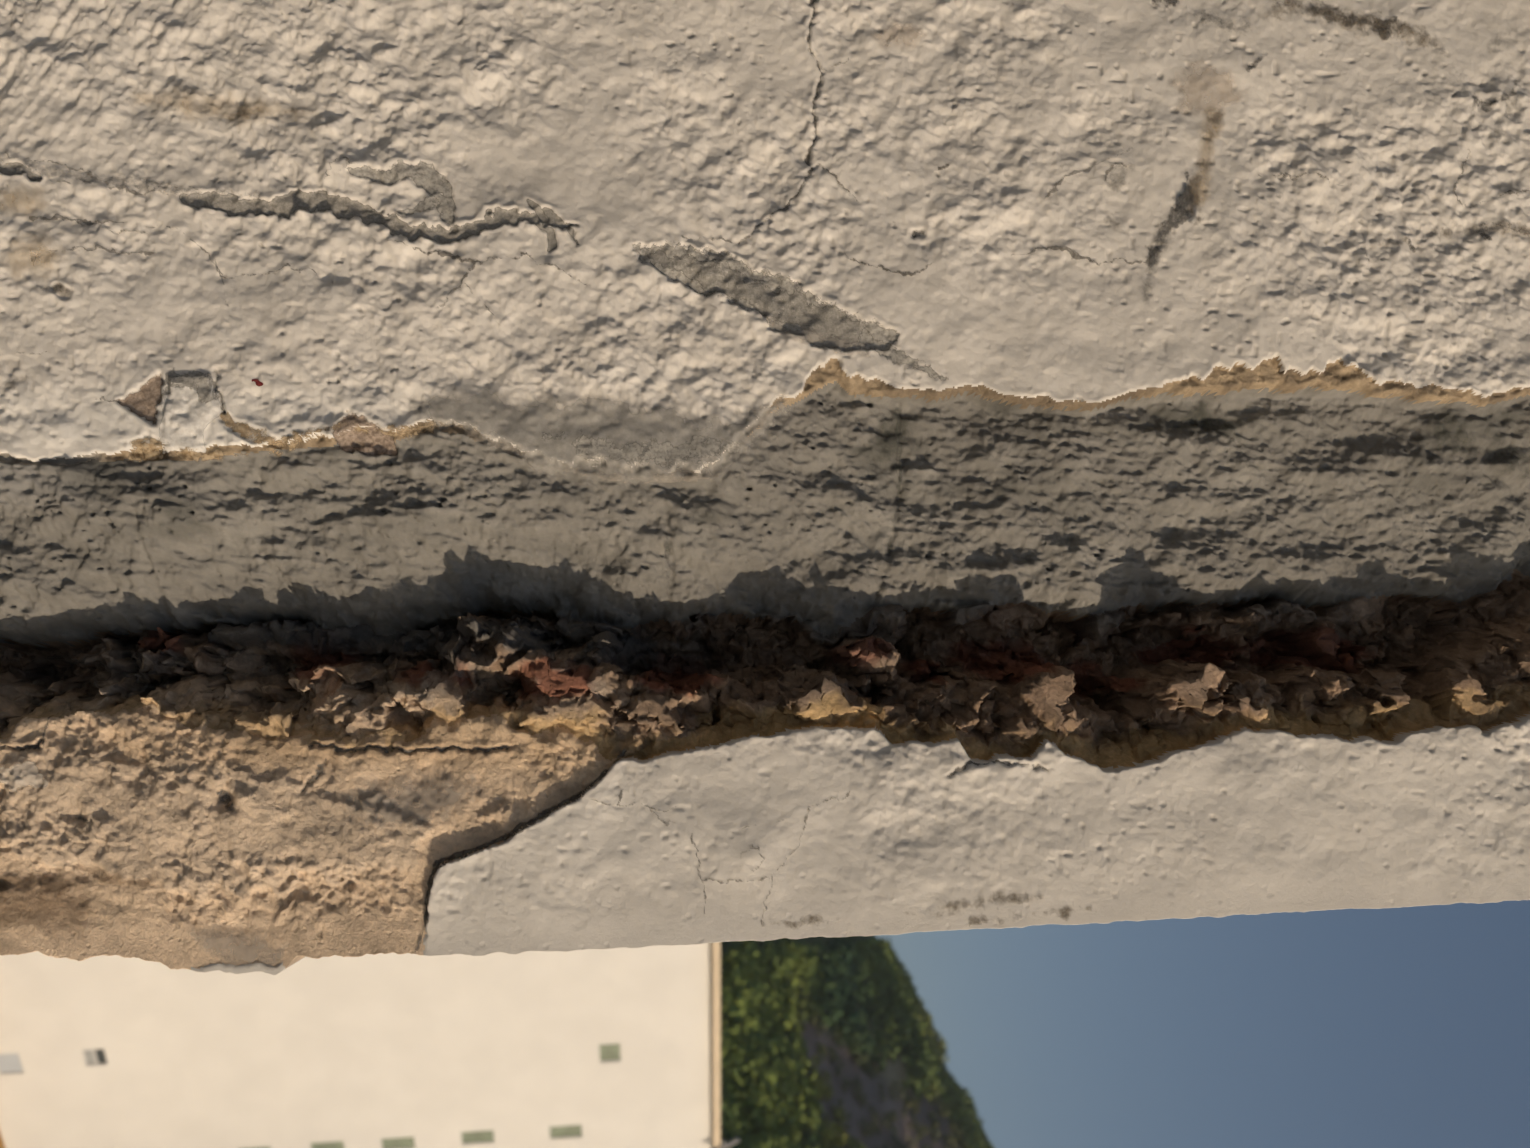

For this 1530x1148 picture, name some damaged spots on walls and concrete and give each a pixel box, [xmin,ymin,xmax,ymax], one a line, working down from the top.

peeling [0,152,579,252]
crack [739,0,849,244]
leakage [1146,172,1202,267]
spalling [0,236,1530,970]